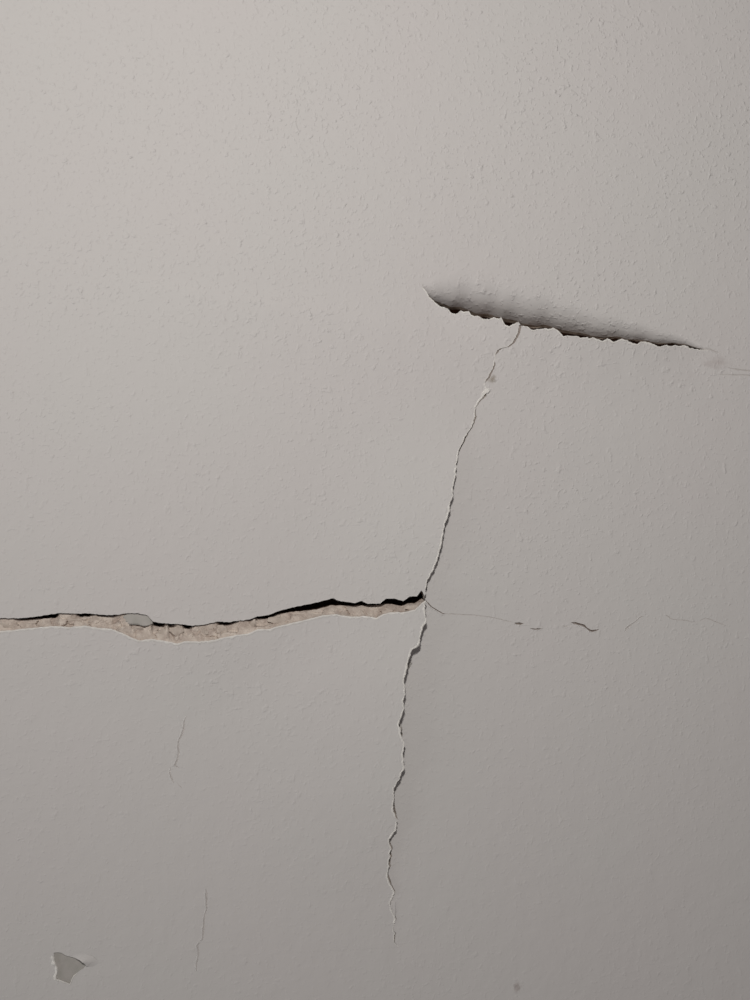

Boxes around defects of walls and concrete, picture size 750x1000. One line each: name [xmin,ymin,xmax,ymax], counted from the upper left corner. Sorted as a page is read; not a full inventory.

crack [0,268,750,947]
spalling [51,952,99,985]